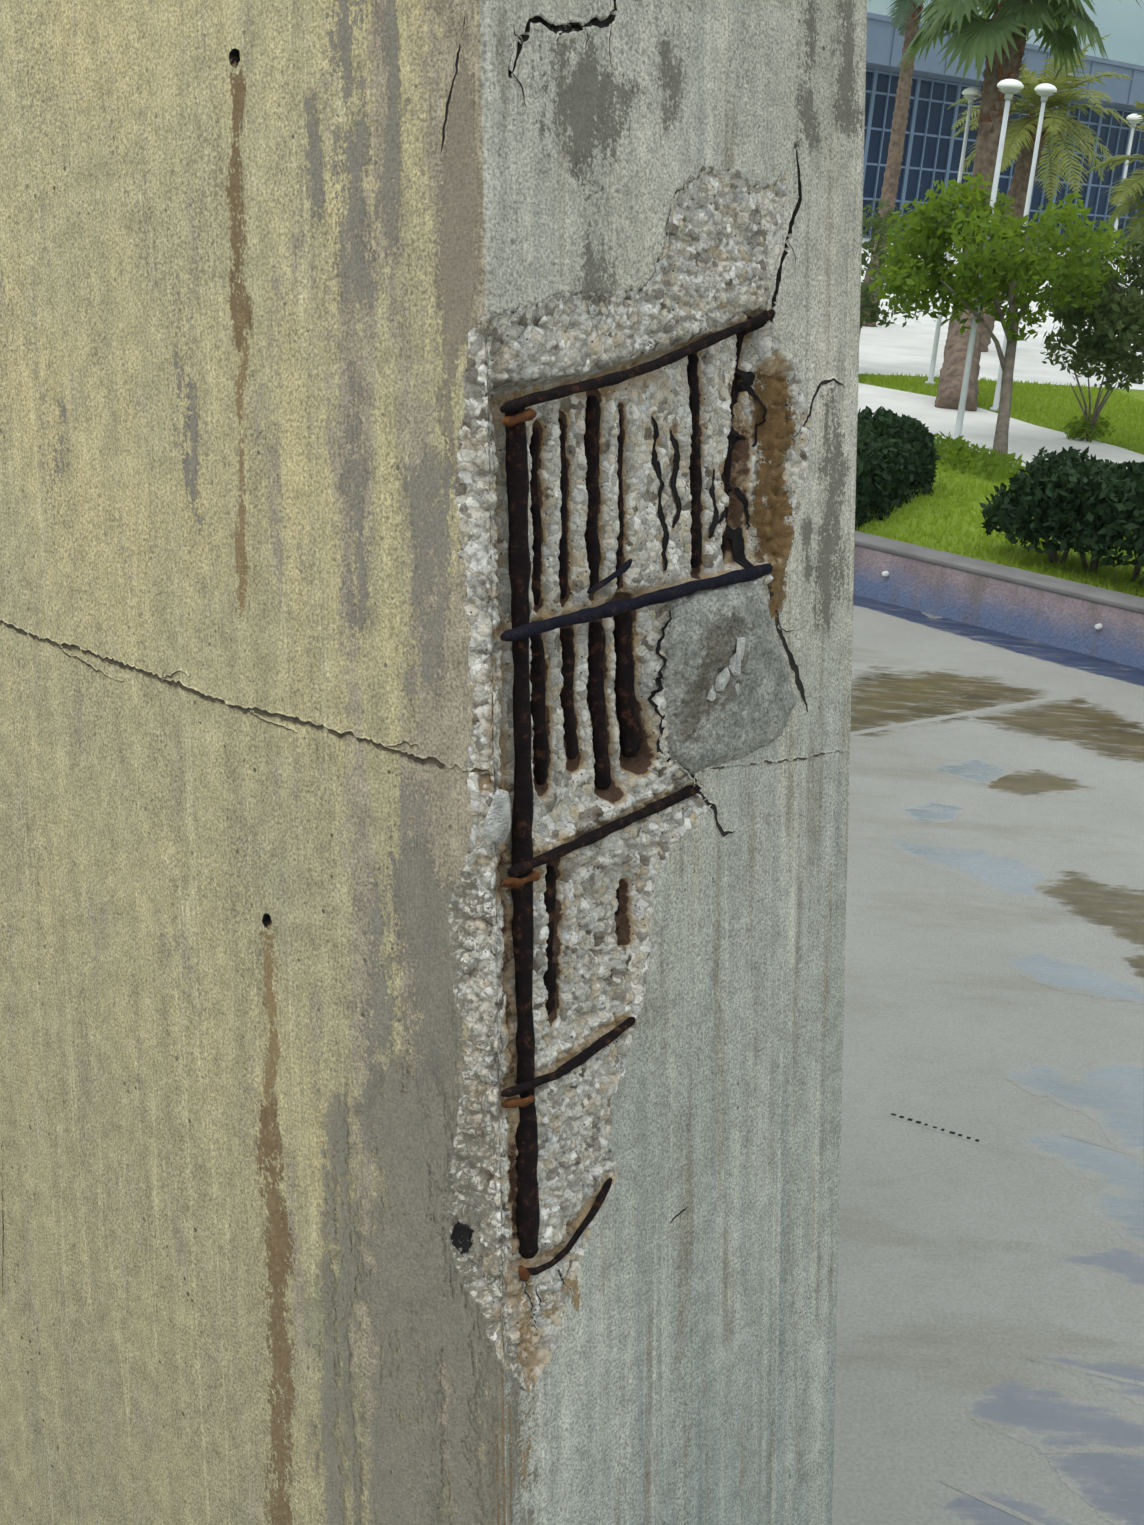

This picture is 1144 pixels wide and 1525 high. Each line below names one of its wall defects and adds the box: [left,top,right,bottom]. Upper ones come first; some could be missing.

crack [508,0,621,113]
corrosion [226,59,251,619]
crack [0,619,493,776]
spalling [303,0,811,1525]
crack [647,611,847,838]
crack [651,147,845,715]
corrosion [745,368,800,620]
corrosion [257,923,296,1525]